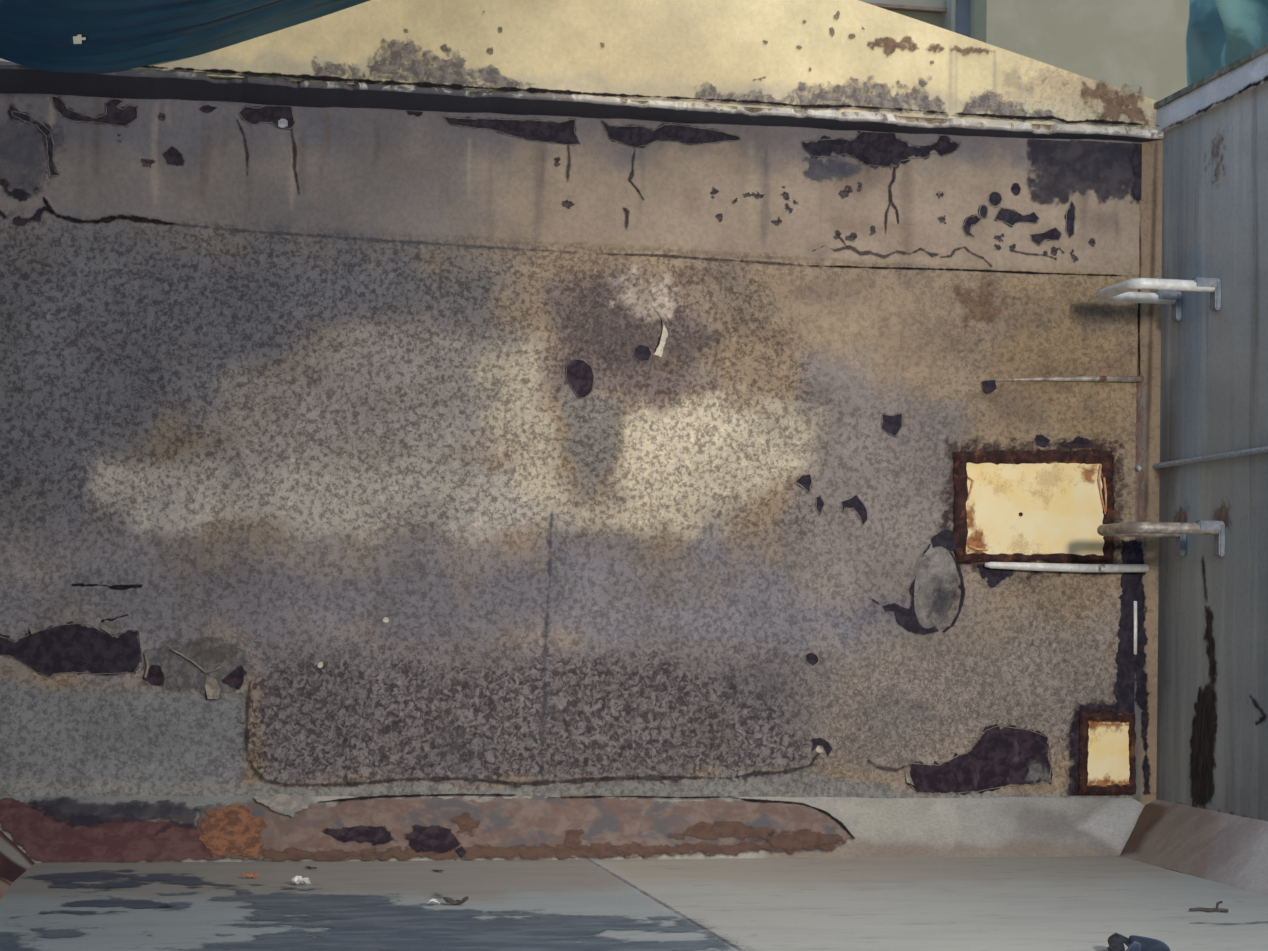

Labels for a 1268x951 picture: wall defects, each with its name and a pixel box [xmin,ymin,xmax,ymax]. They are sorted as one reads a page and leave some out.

corrosion [867,37,989,56]
peeling [696,68,1052,121]
spalling [771,186,798,226]
spalling [802,131,961,241]
peeling [962,183,1078,262]
corrosion [941,382,1145,578]
peeling [0,620,142,677]
corrosion [0,650,855,862]
corrosion [868,760,910,772]
peeling [905,724,1053,795]
corrosion [1067,702,1133,796]